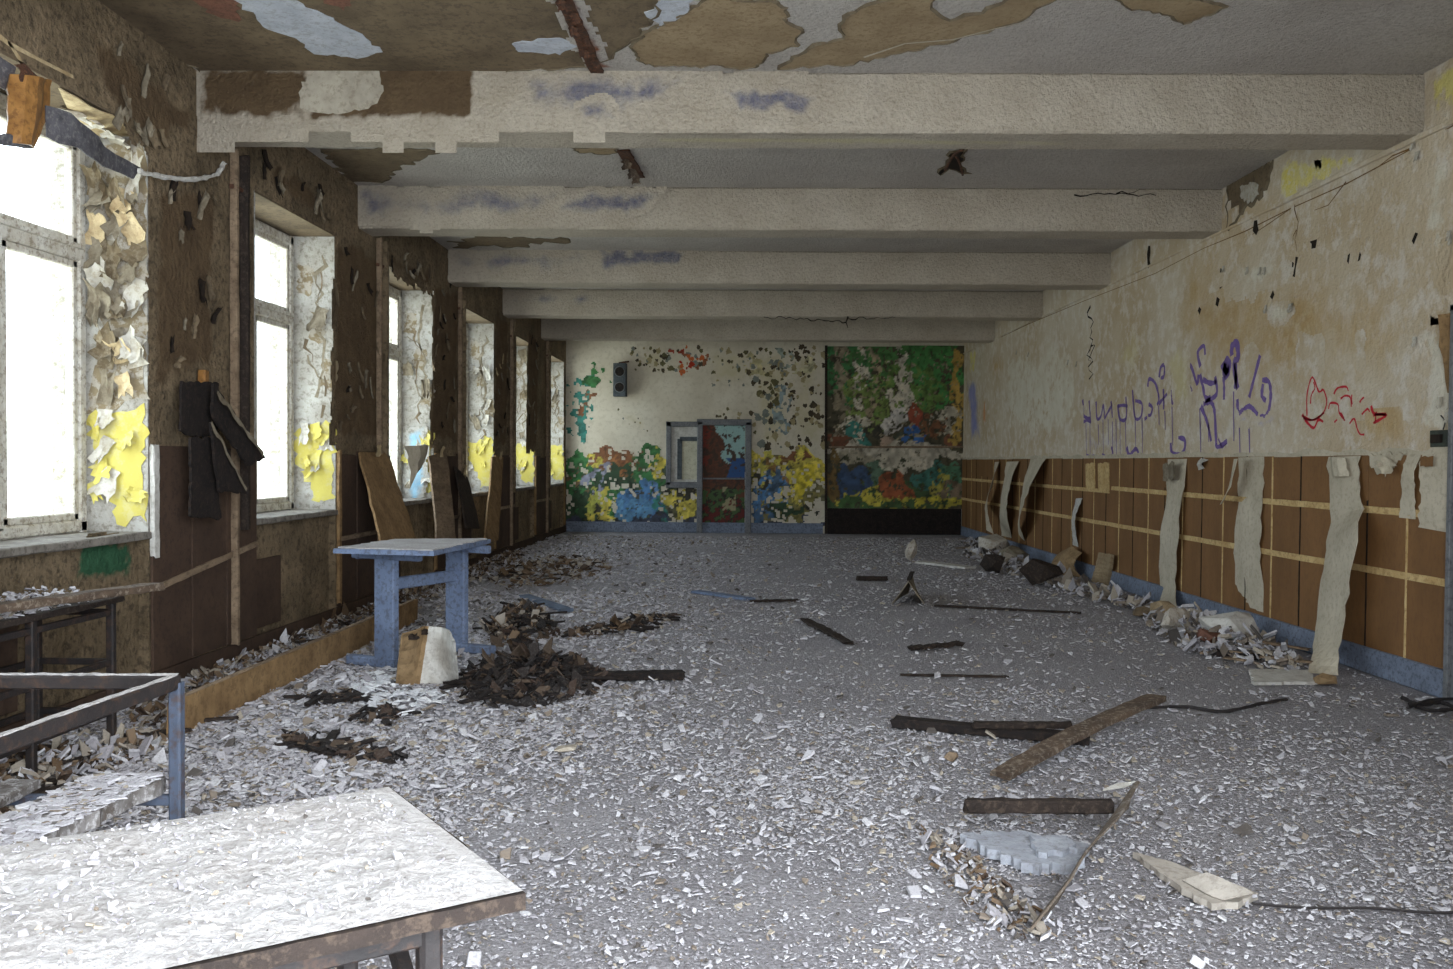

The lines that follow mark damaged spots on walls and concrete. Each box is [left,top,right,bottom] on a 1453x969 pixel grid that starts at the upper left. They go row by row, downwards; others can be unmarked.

flaking render [193,0,241,22]
corrosion [546,0,618,74]
spalling [506,0,1056,72]
spalling [1115,0,1229,25]
peeling [299,71,384,114]
corrosion [617,149,645,185]
peeling [58,11,223,504]
peeling [1198,159,1317,329]
peeling [627,341,825,454]